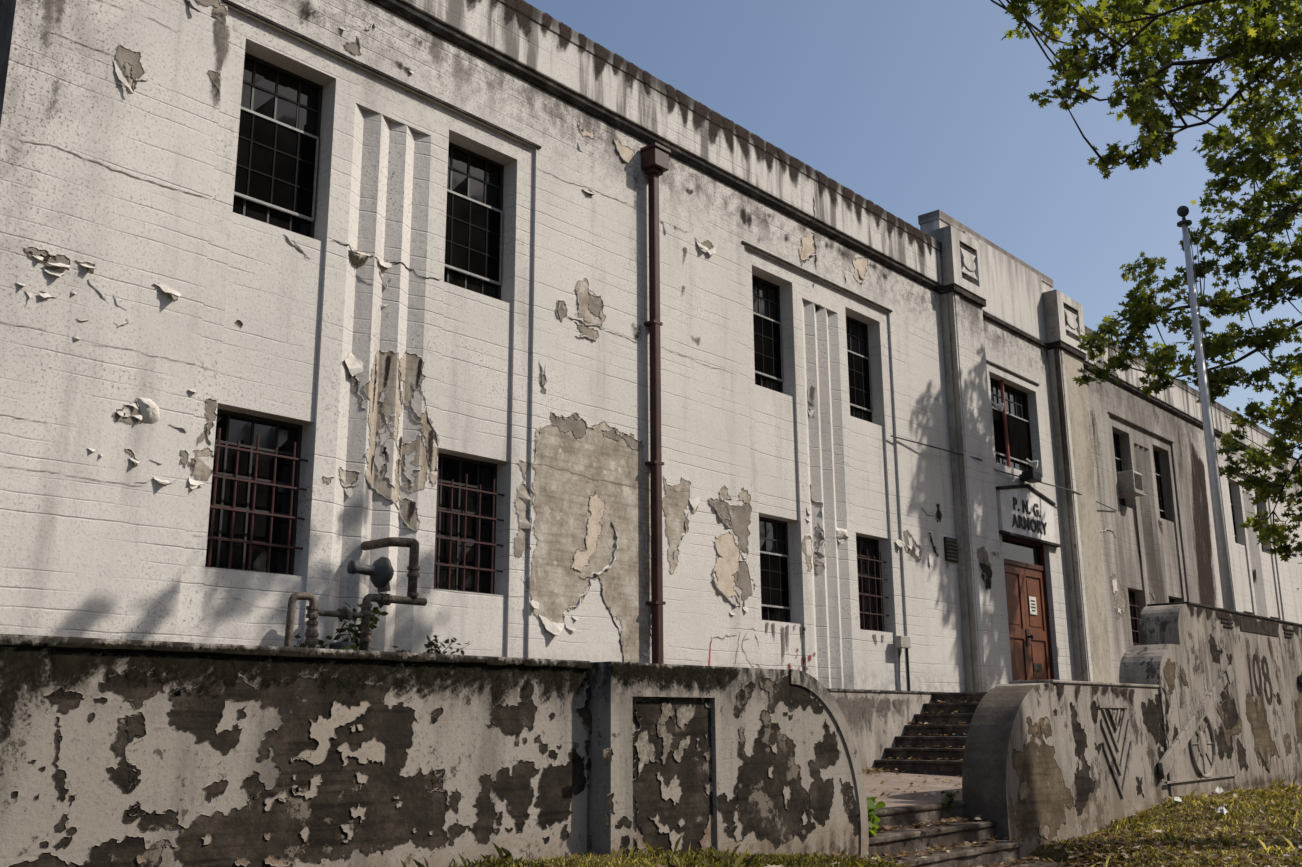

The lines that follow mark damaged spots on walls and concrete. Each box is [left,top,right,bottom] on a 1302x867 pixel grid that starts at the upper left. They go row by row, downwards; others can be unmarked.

leakage [27,0,66,54]
leakage [212,13,230,104]
leakage [298,1,325,24]
leakage [467,0,932,256]
crack [331,240,441,280]
peeling [112,388,218,490]
peeling [322,350,439,532]
peeling [513,411,755,663]
peeling [6,667,614,867]
peeling [605,675,860,856]
peeling [1011,683,1124,845]
peeling [1141,658,1189,760]